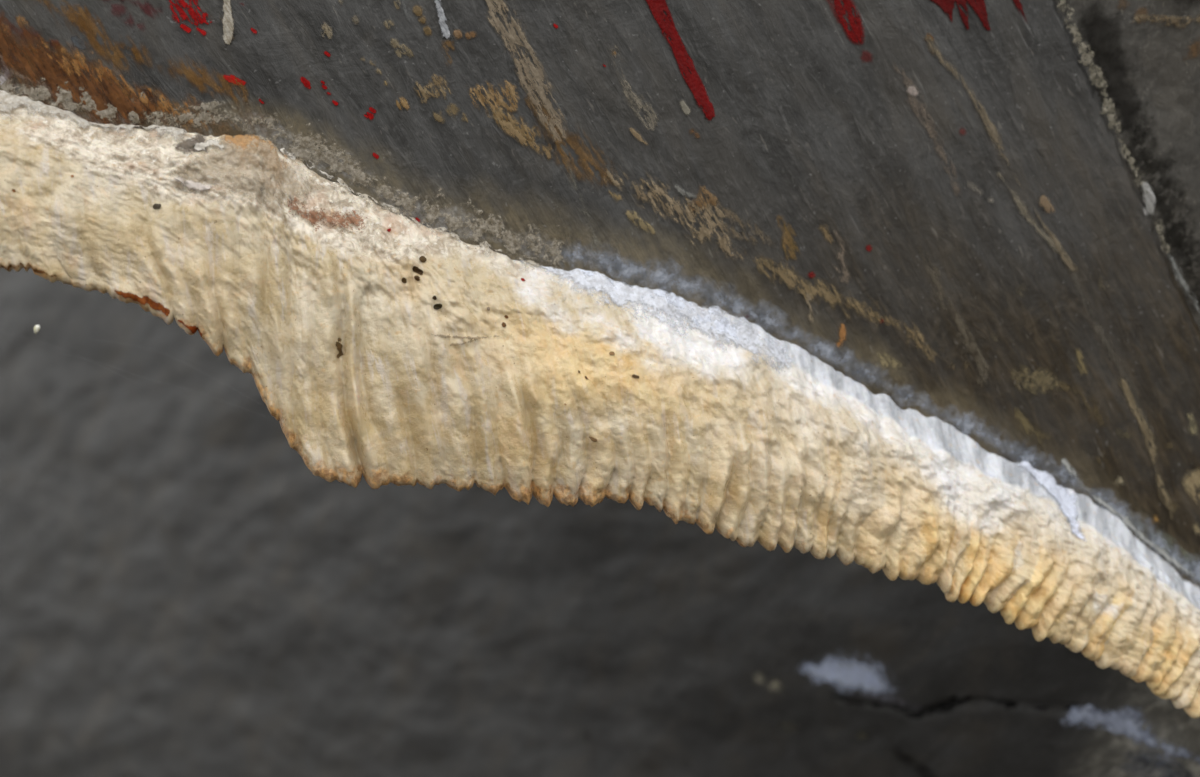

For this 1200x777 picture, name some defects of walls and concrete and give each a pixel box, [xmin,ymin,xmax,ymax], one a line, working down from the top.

leakage [51,86,117,121]
rust [0,0,254,137]
leakage [144,101,378,187]
leakage [485,0,612,184]
leakage [1081,4,1200,306]
leakage [443,198,564,267]
leakage [539,265,792,368]
leakage [754,216,935,363]
crack [926,34,1173,517]
leakage [1015,449,1084,539]
leakage [802,657,917,709]
leakage [1062,705,1200,776]